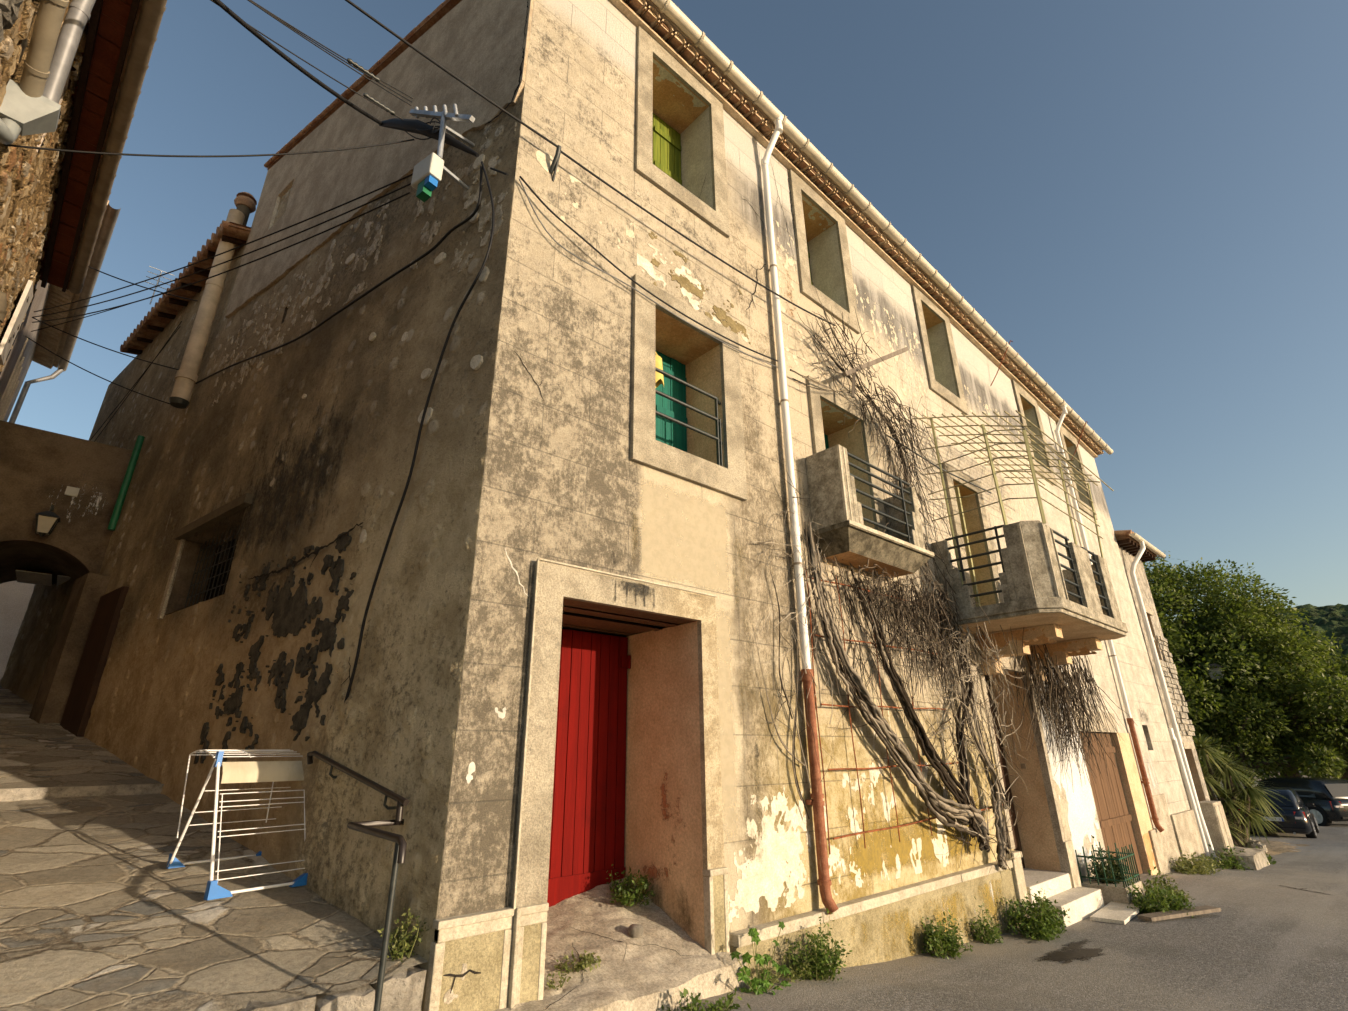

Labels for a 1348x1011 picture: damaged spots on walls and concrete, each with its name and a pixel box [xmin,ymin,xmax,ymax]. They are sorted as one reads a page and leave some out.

peeling [212,199,390,406]
peeling [410,134,511,283]
flaking render [470,355,483,370]
flaking render [611,222,723,326]
damp [194,526,365,764]
peeling [728,785,811,923]
peeling [824,708,964,896]